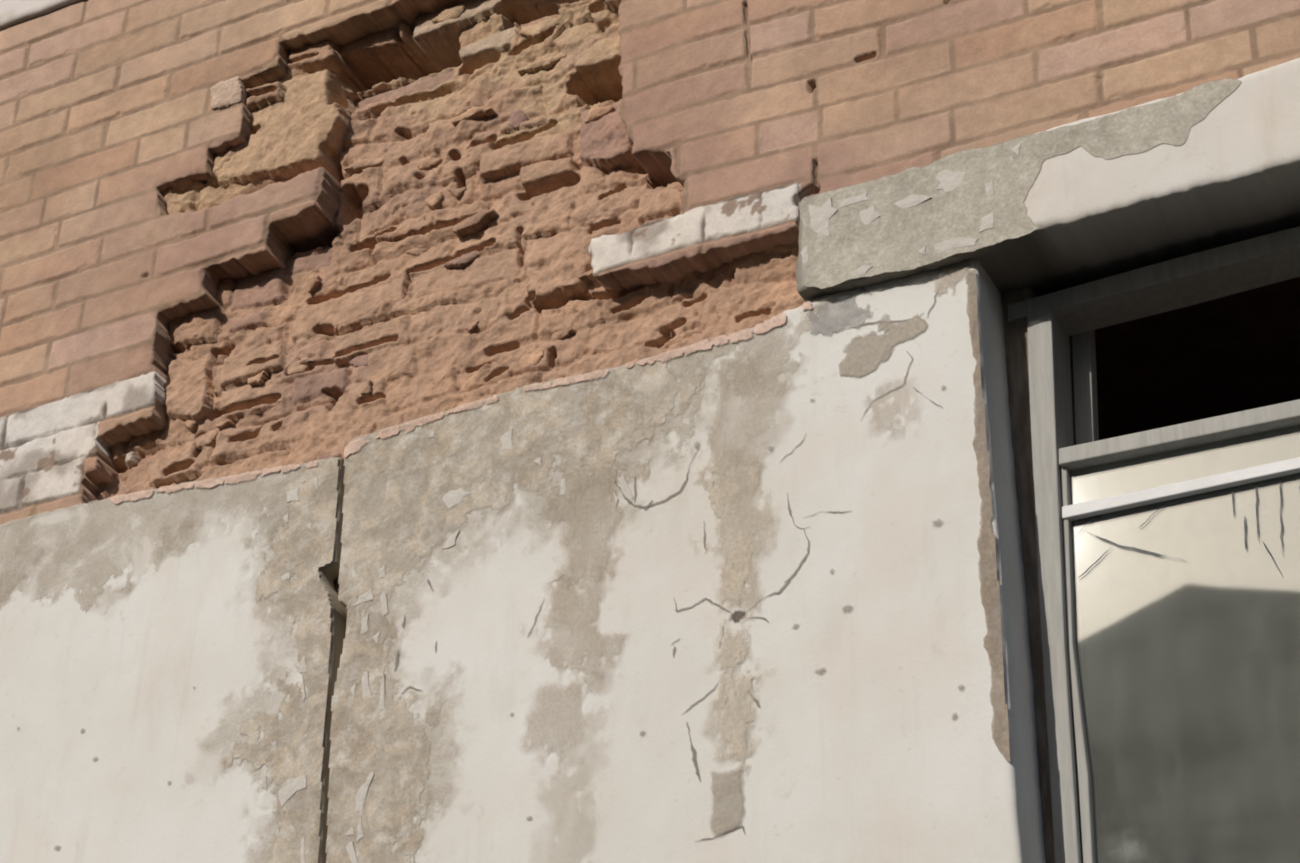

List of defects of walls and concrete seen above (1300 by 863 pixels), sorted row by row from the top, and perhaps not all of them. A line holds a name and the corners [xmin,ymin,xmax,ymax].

peeling [799,79,1241,289]
damp [625,313,786,368]
peeling [839,315,927,377]
damp [109,460,317,504]
spalling [36,0,805,863]
damp [344,394,498,457]
crack [615,448,700,510]
damp [700,361,781,607]
crack [671,492,849,657]
crack [681,681,719,781]
damp [711,633,757,834]
crack [745,692,760,745]